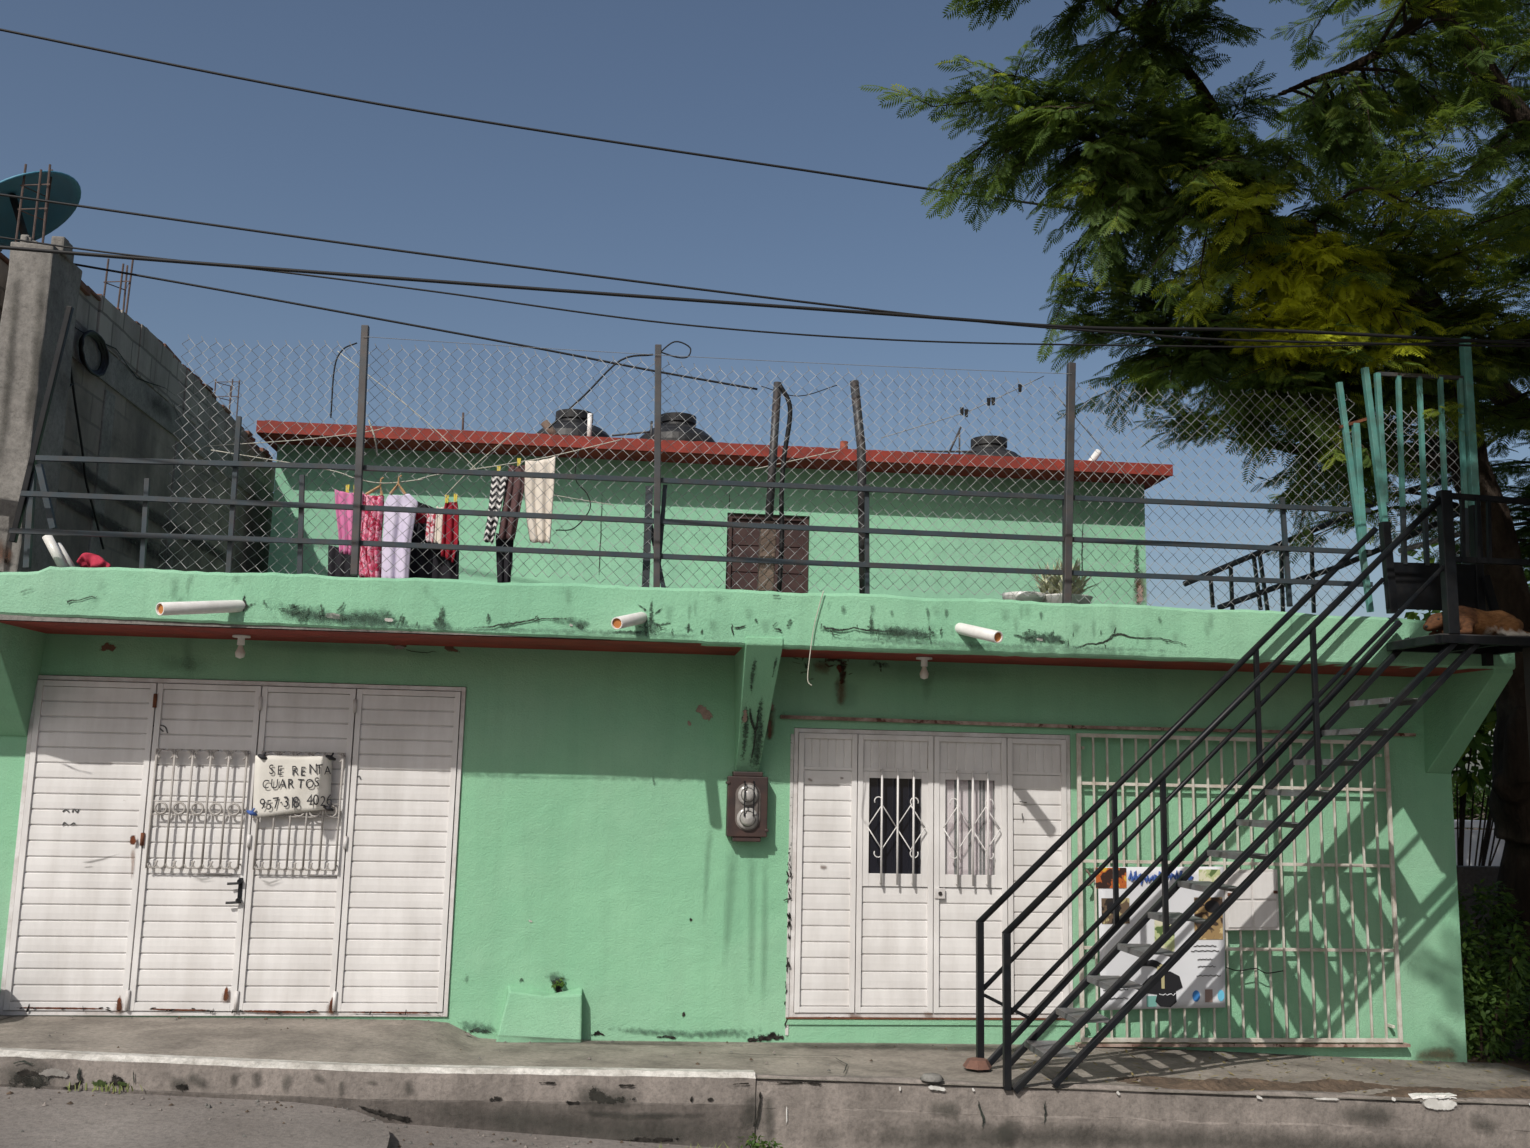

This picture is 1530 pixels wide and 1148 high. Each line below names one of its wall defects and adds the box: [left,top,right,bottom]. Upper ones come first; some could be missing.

water stain [326,604,703,637]
crack [473,615,567,628]
crack [1079,627,1186,647]
corrosion [817,658,852,702]
water stain [740,657,808,765]